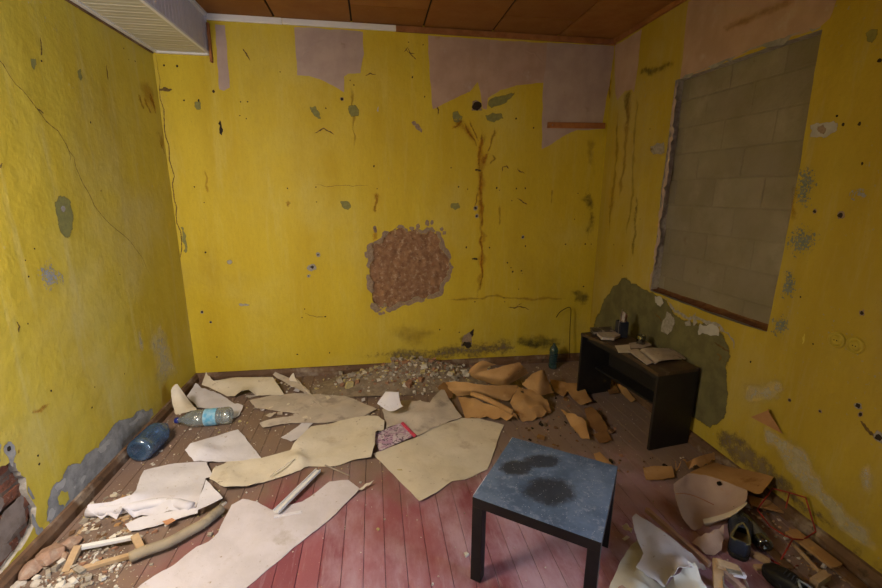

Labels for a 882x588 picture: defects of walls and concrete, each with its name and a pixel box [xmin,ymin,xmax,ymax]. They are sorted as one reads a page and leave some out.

crack [0,61,151,276]
crack [156,59,182,257]
flaking render [364,220,454,315]
peeling [472,93,514,122]
flaking render [594,81,734,427]
flaking render [0,409,153,566]